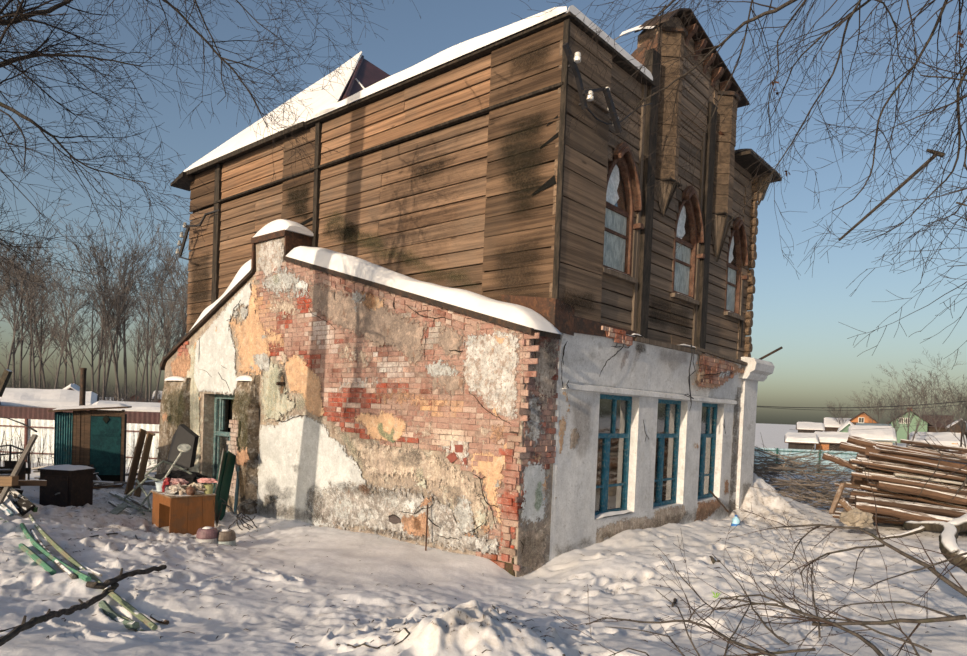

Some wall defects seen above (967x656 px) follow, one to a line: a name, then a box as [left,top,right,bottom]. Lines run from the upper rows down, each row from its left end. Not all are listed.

leakage [502,115,542,212]
spalling [229,238,580,576]
spalling [601,326,633,346]
spalling [692,353,745,391]